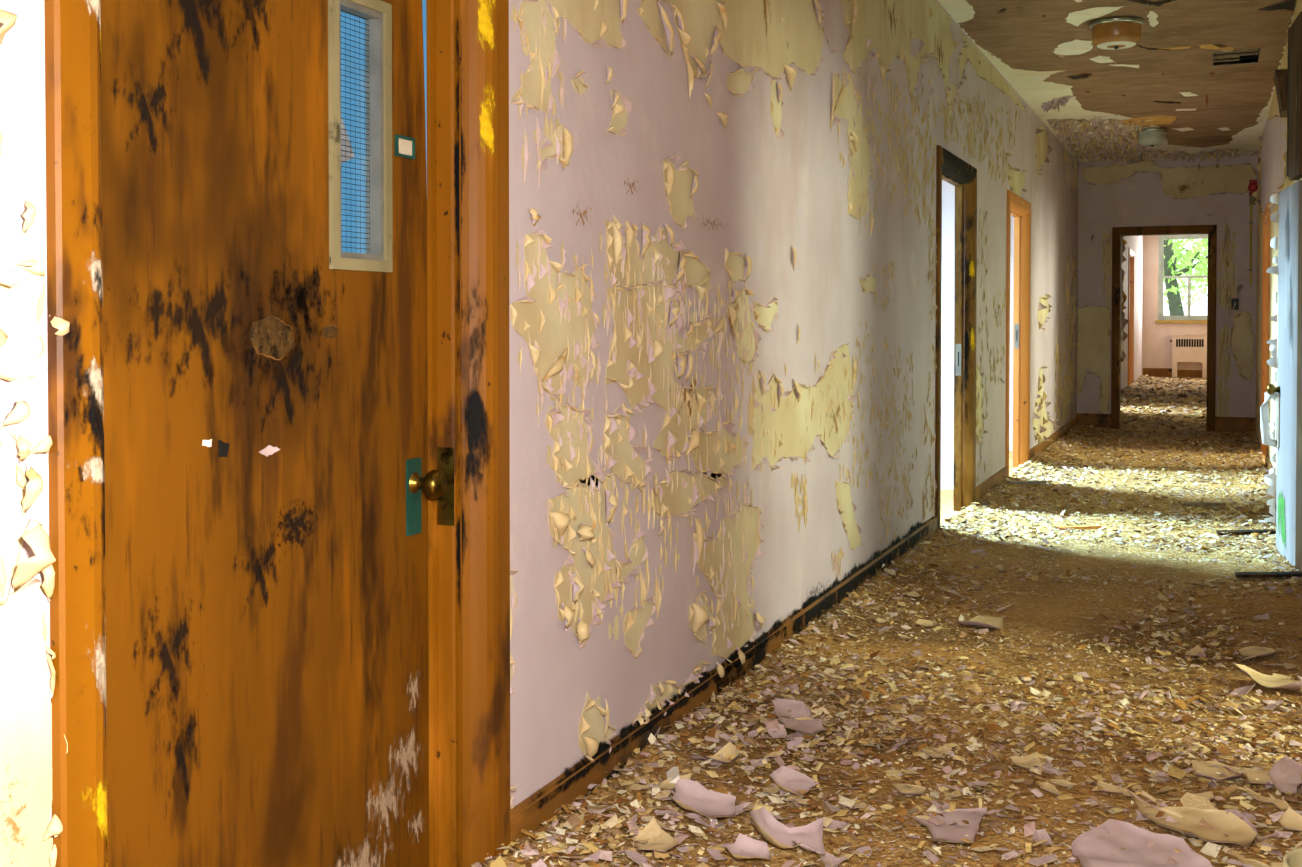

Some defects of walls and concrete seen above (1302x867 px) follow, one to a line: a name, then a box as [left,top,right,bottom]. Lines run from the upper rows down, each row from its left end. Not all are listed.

peeling [0,9,17,45]
peeling [22,200,37,235]
leakage [454,21,486,373]
peeling [0,258,70,384]
leakage [459,389,490,499]
leakage [456,511,466,606]
peeling [0,400,68,867]